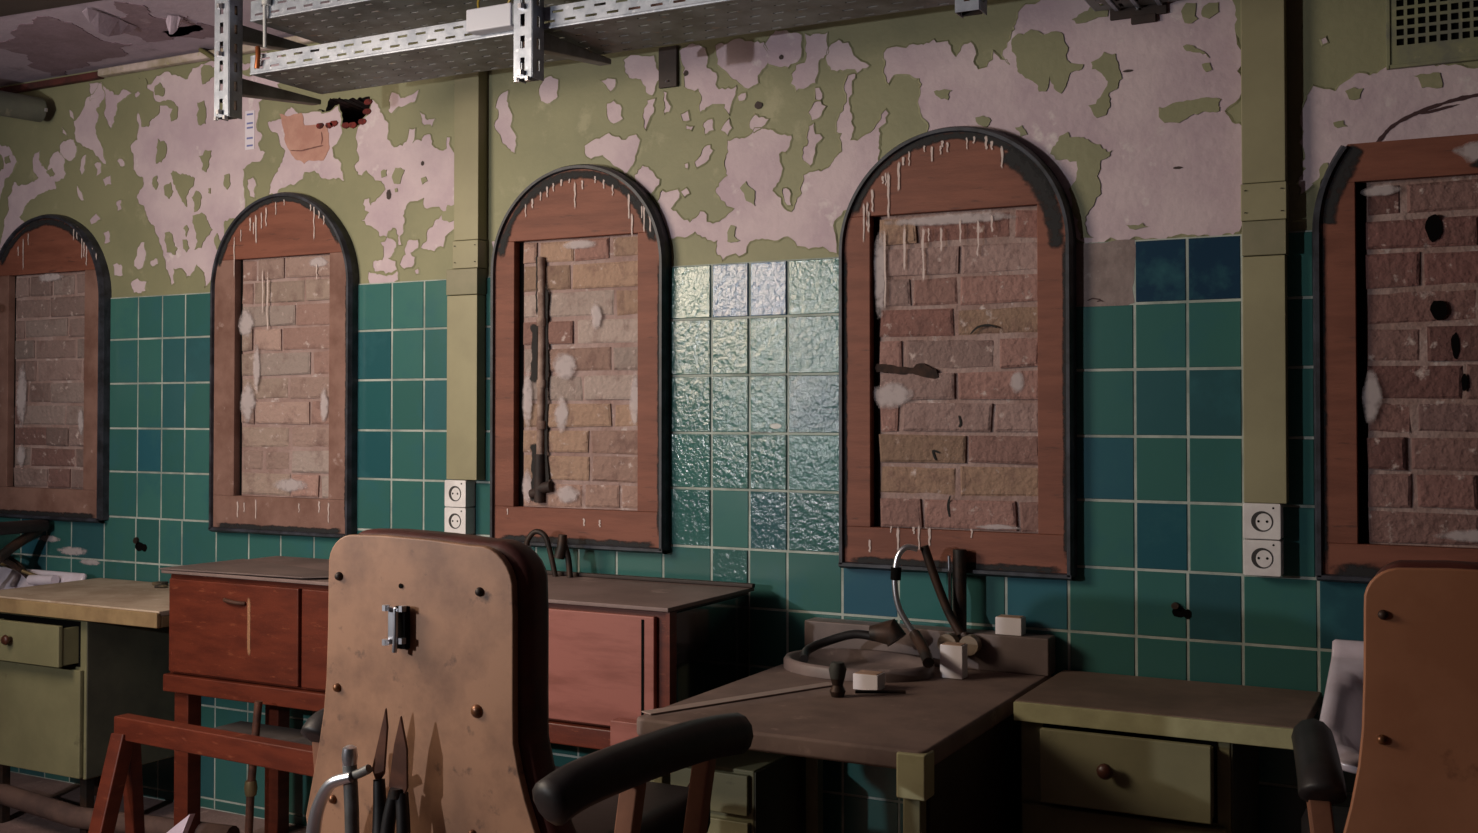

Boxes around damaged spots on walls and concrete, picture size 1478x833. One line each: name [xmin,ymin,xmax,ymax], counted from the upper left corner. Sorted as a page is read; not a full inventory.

peeling [0,1,454,295]
peeling [493,89,518,154]
peeling [538,74,560,106]
peeling [583,0,1242,307]
peeling [1297,63,1478,196]
damp [1,219,97,267]
damp [218,197,339,266]
damp [498,170,656,256]
damp [843,132,1067,573]
damp [502,266,659,548]
damp [0,509,93,518]
damp [219,478,345,534]